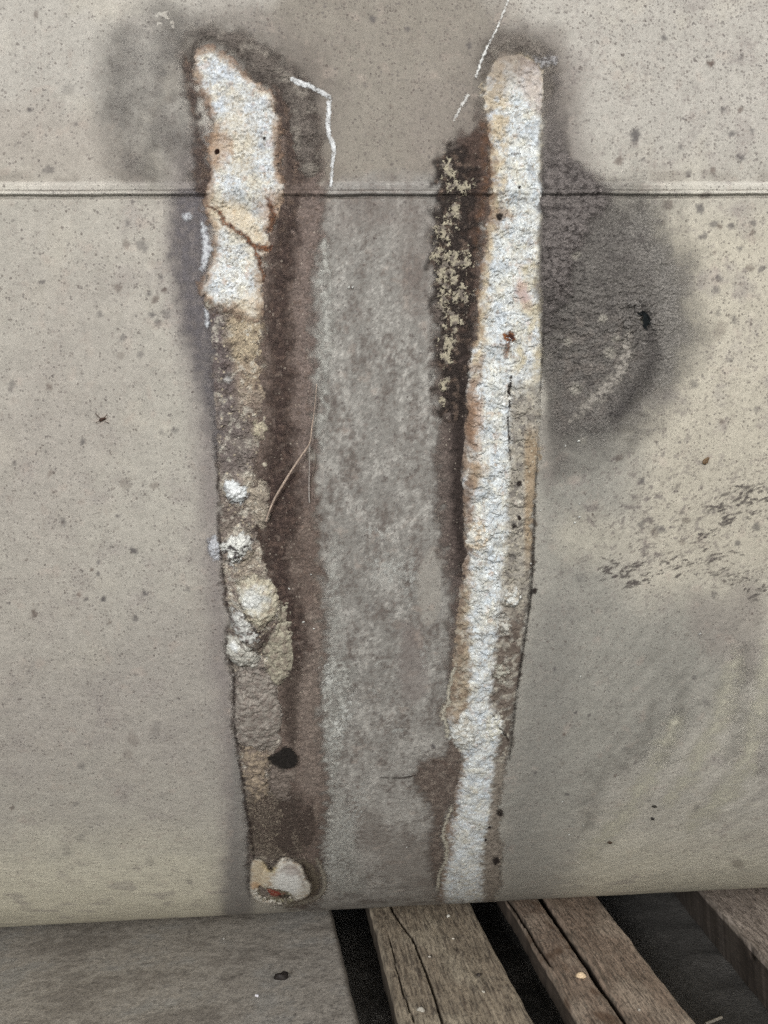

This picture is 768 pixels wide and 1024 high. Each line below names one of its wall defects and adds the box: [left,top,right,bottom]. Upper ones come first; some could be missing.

water stain [316,241,332,378]
peeling [425,141,481,422]
spalling [204,300,309,898]
water stain [434,50,558,904]
water stain [318,657,362,893]